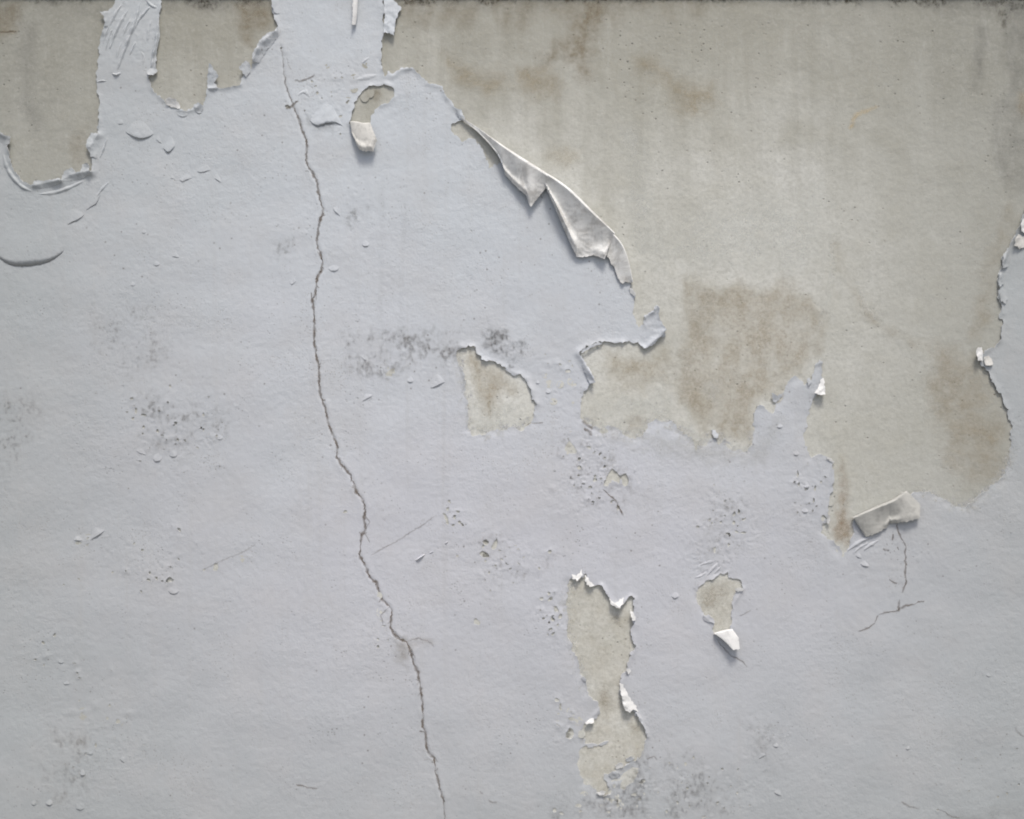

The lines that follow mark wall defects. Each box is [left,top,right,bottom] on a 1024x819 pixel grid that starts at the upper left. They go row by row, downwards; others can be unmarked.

peeling [0,0,115,189]
peeling [147,0,282,112]
peeling [325,0,1024,557]
crack [294,102,444,800]
spalling [479,534,524,591]
peeling [539,569,659,813]
peeling [696,573,743,650]